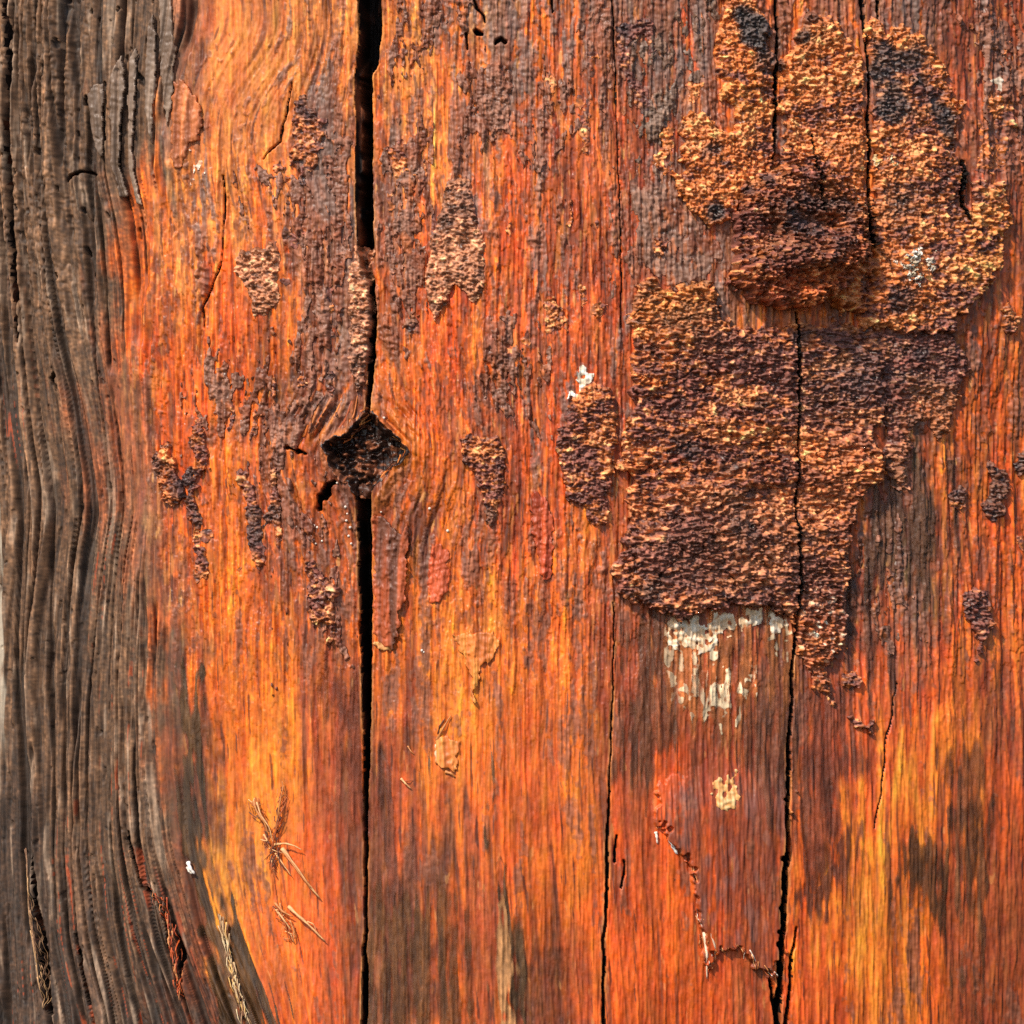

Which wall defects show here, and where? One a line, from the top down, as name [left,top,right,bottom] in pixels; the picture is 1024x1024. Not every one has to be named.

crack [354,0,382,250]
crack [611,0,622,328]
crack [771,0,779,160]
crack [811,134,828,212]
crack [859,0,883,248]
crack [366,282,377,406]
crack [318,480,373,1024]
crack [601,603,625,1024]
damp [608,605,793,786]
crack [767,312,805,1024]